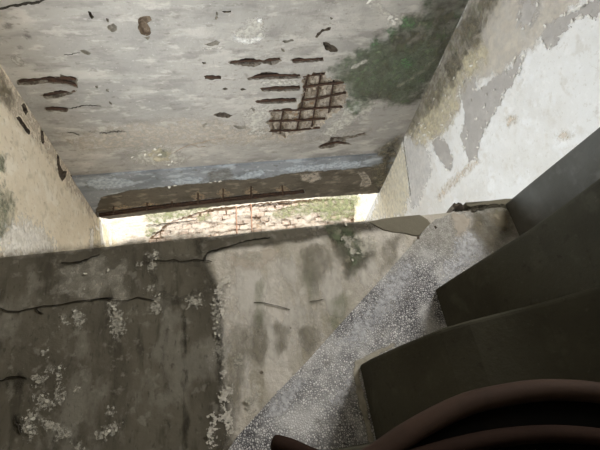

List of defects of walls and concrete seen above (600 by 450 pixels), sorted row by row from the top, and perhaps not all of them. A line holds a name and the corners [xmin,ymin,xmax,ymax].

spalling [138,16,152,40]
peeling [541,0,600,50]
spalling [16,103,30,134]
spalling [17,74,78,99]
spalling [228,39,348,138]
spalling [318,132,366,149]
damp [342,0,578,287]
peeling [459,54,525,162]
crack [148,237,270,263]
crack [1,297,155,314]
damp [344,263,413,346]
damp [0,225,344,450]